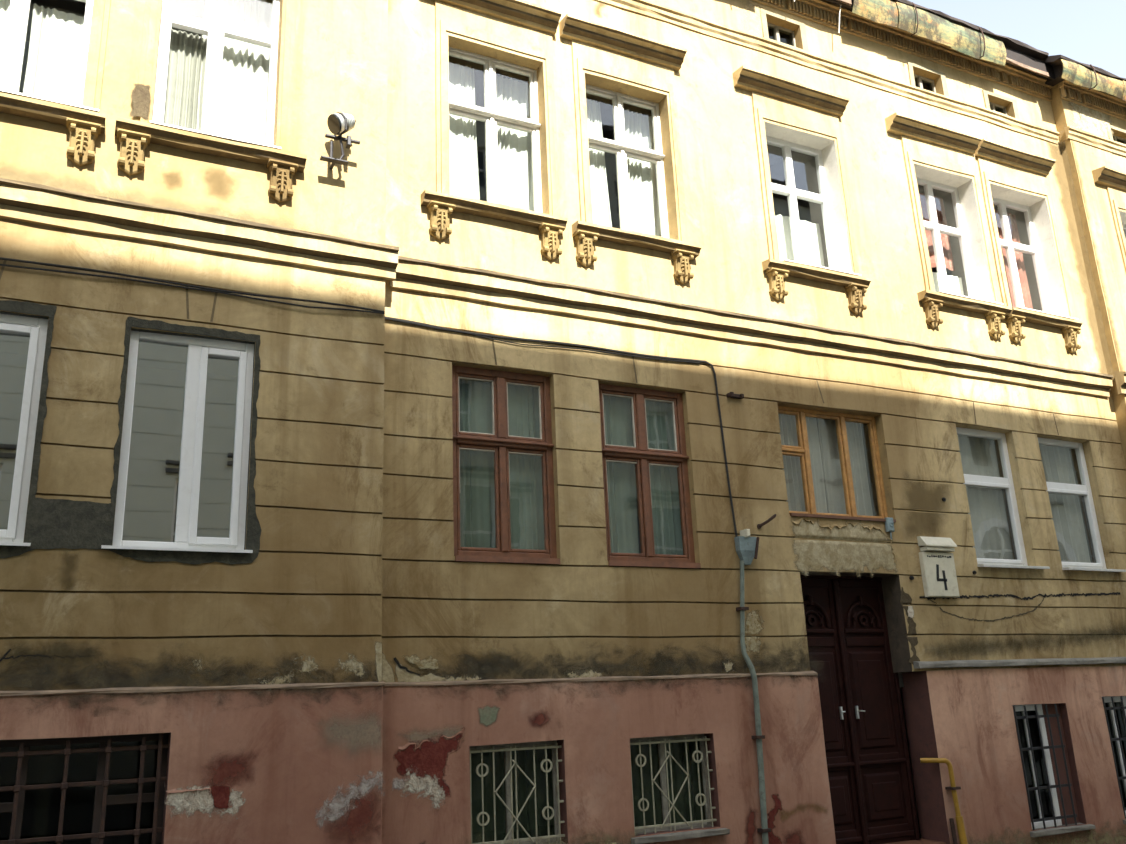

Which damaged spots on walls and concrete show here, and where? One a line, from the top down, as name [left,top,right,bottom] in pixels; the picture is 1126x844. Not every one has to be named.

spalling [791,517,898,575]
leakage [0,645,382,714]
spalling [375,642,447,686]
leakage [423,650,819,693]
spalling [165,756,250,817]
peeling [393,728,465,808]